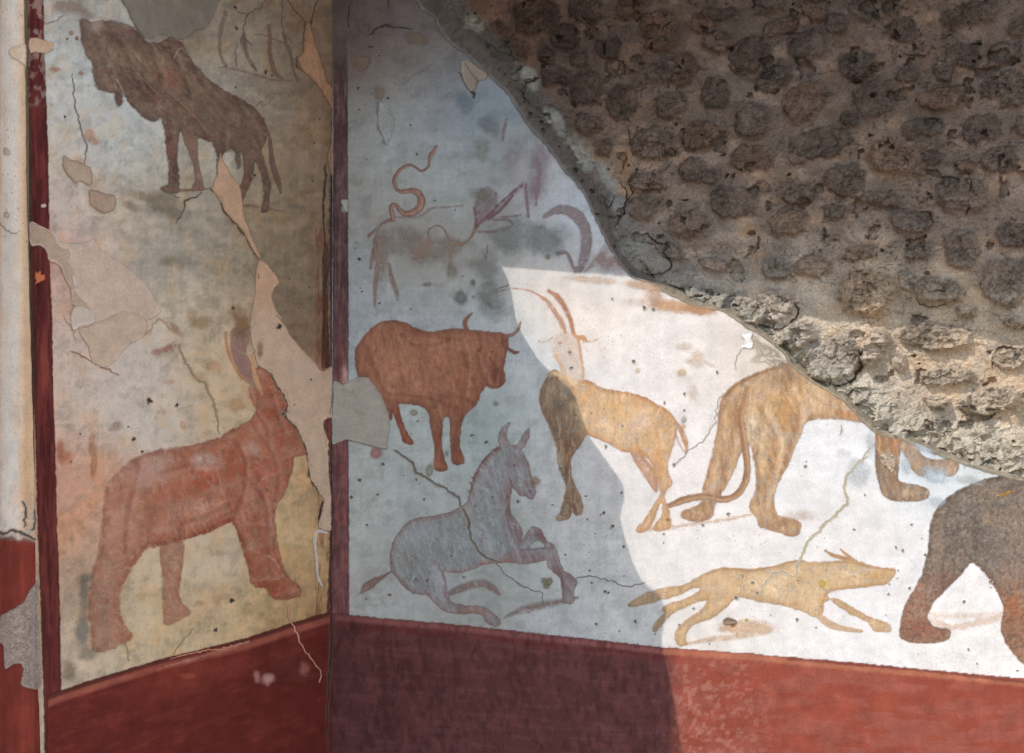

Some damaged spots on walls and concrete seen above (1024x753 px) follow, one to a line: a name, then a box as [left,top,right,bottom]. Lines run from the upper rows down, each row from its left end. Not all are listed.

spalling [63,156,116,213]
peeling [29,222,161,367]
spalling [212,154,332,588]
spalling [416,0,1024,482]
crack [270,370,333,753]
crack [393,449,543,605]
crack [574,575,645,587]
crack [759,448,870,597]